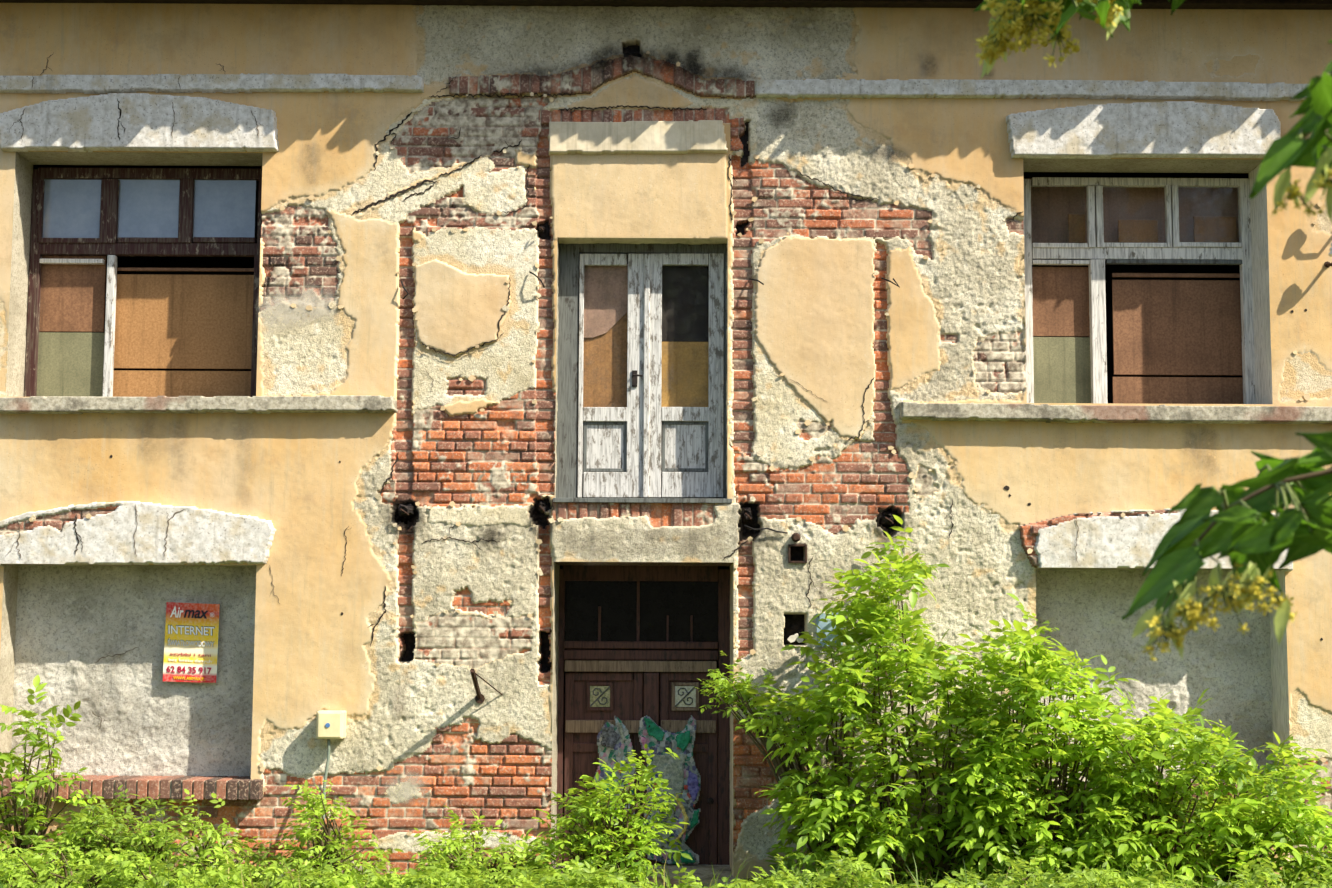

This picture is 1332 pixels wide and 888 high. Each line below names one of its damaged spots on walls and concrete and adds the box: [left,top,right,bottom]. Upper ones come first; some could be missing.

crack [117,99,126,140]
crack [352,77,707,214]
crack [73,514,83,553]
crack [134,505,185,556]
crack [422,522,500,550]
flaking render [92,5,860,875]
flaking render [728,98,1180,860]
flaking render [1288,690,1332,879]